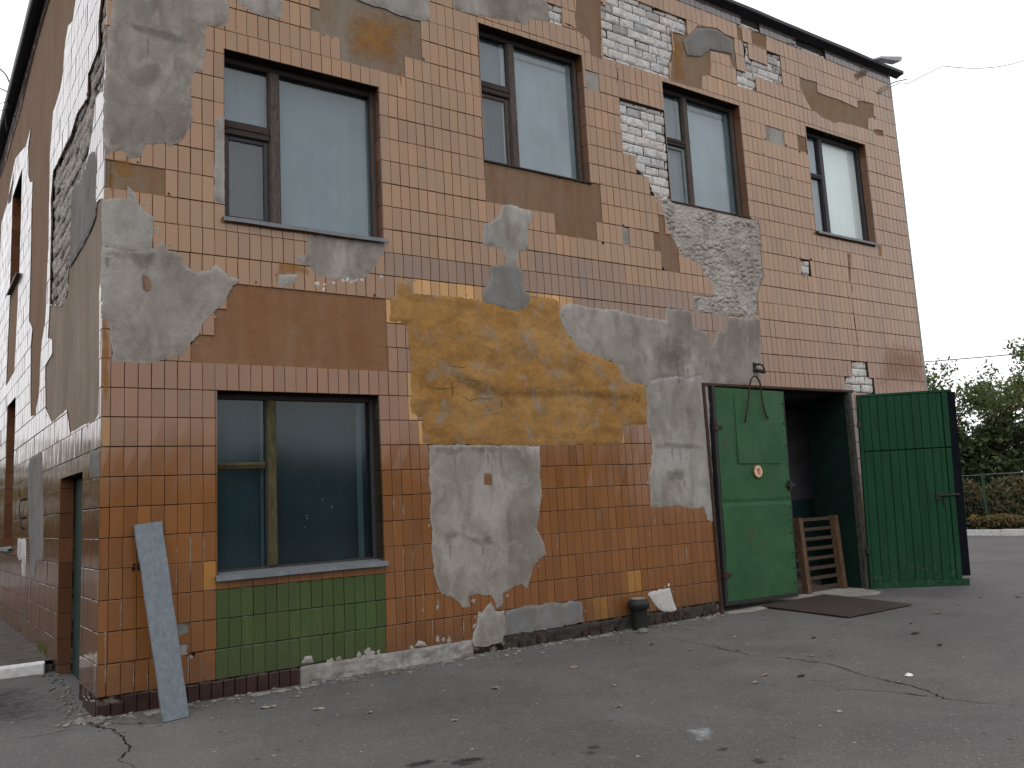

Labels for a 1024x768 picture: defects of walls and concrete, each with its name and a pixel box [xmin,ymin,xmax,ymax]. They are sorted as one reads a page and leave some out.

spalling [307,0,429,79]
flaking render [548,0,782,91]
spalling [799,78,883,136]
spalling [0,0,107,432]
spalling [484,162,602,241]
spalling [620,101,765,317]
peeling [142,275,151,292]
spalling [175,277,393,373]
spalling [504,610,633,649]
spalling [647,583,717,626]